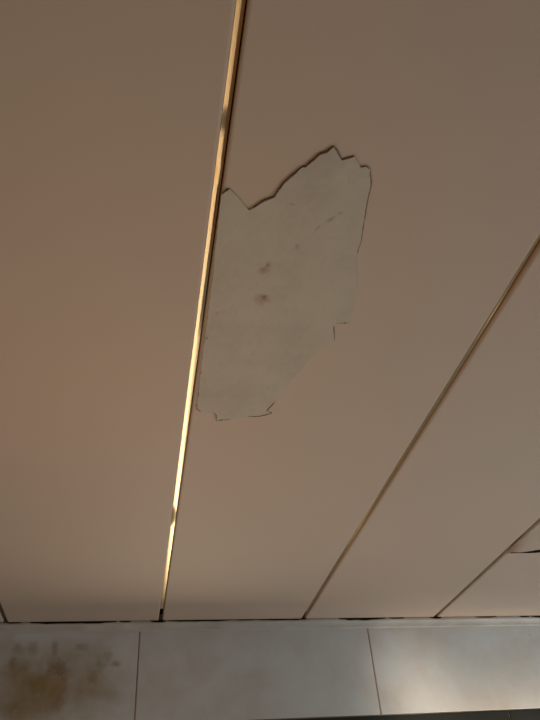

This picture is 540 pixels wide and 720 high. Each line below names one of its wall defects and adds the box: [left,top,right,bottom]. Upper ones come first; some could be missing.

peeling [197,146,372,421]